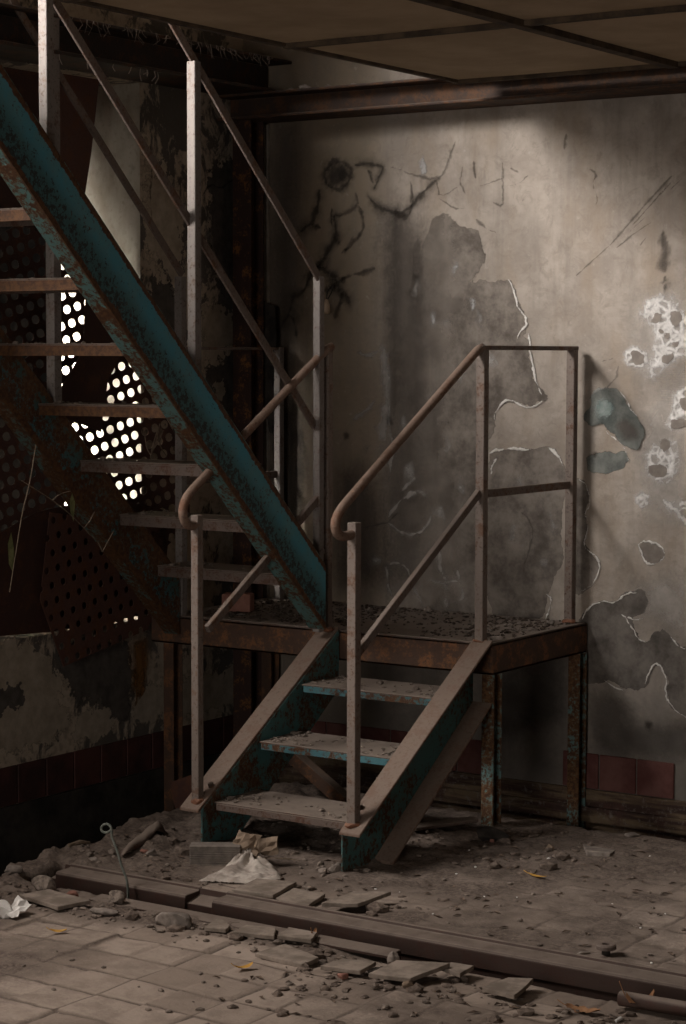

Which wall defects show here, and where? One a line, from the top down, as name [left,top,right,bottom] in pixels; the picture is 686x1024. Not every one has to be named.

rust [4,67,39,122]
rust [60,74,99,192]
rust [83,300,114,343]
leakage [624,232,686,377]
rust [62,356,120,403]
peeling [423,213,601,619]
flaking render [584,387,645,460]
leakage [646,387,686,483]
rust [0,505,148,636]
flaking render [638,540,665,565]
peeling [183,664,233,719]
peeling [579,589,686,716]